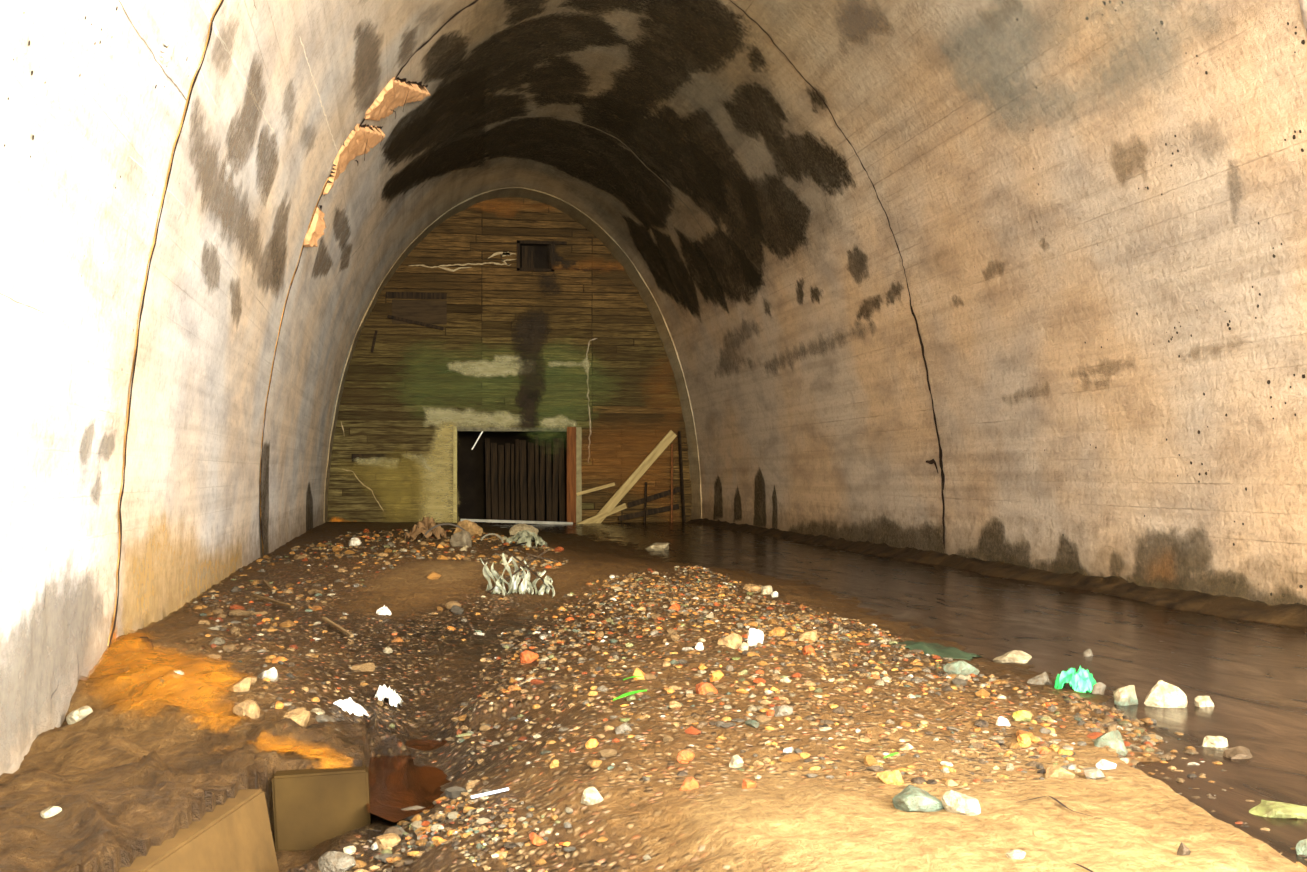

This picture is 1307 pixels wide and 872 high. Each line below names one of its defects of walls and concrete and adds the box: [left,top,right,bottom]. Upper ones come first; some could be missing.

leakage [355,28,378,109]
crack [107,0,276,663]
leakage [202,247,241,325]
leakage [191,62,290,293]
leakage [312,210,352,277]
spalling [302,77,431,247]
leakage [357,311,575,523]
leakage [382,0,852,317]
leakage [720,285,902,372]
crack [730,0,945,549]
leakage [713,469,1307,606]
leakage [0,571,103,749]